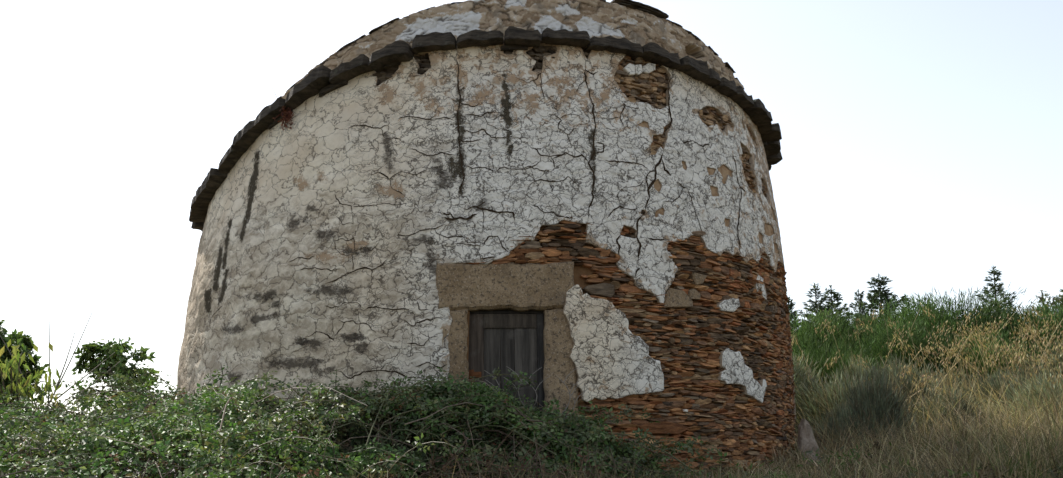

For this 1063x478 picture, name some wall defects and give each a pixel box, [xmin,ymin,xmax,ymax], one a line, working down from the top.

crack [290,51,745,379]
spalling [464,106,798,478]
spalling [614,56,669,112]